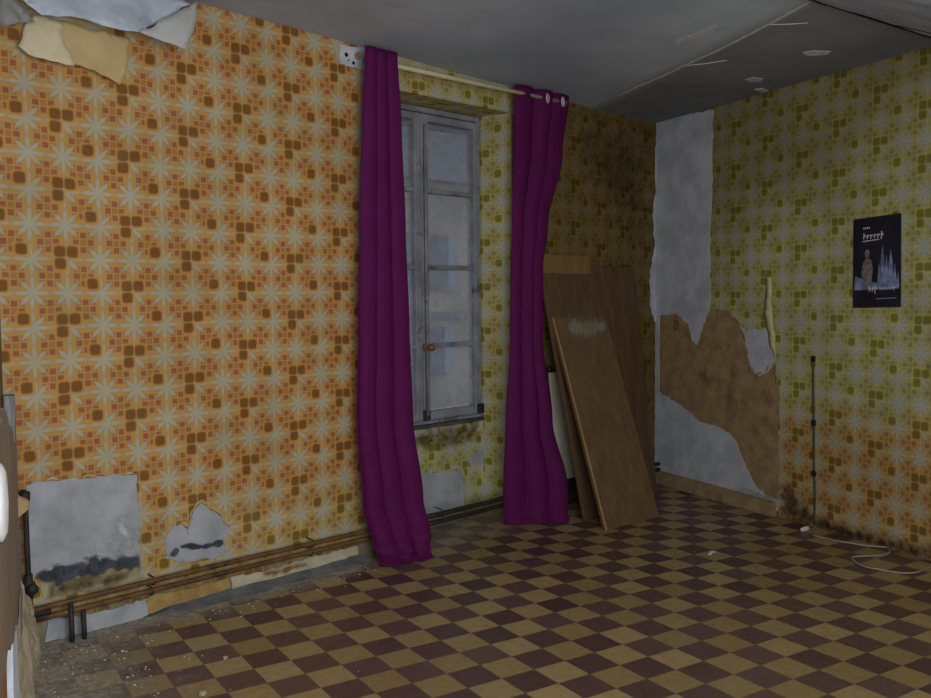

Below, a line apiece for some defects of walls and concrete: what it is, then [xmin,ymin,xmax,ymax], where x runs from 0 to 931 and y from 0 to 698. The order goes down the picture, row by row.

peeling [61,21,130,85]
peeling [649,110,780,510]
flaking render [25,472,141,574]
flaking render [164,499,231,562]
water stain [36,556,144,600]